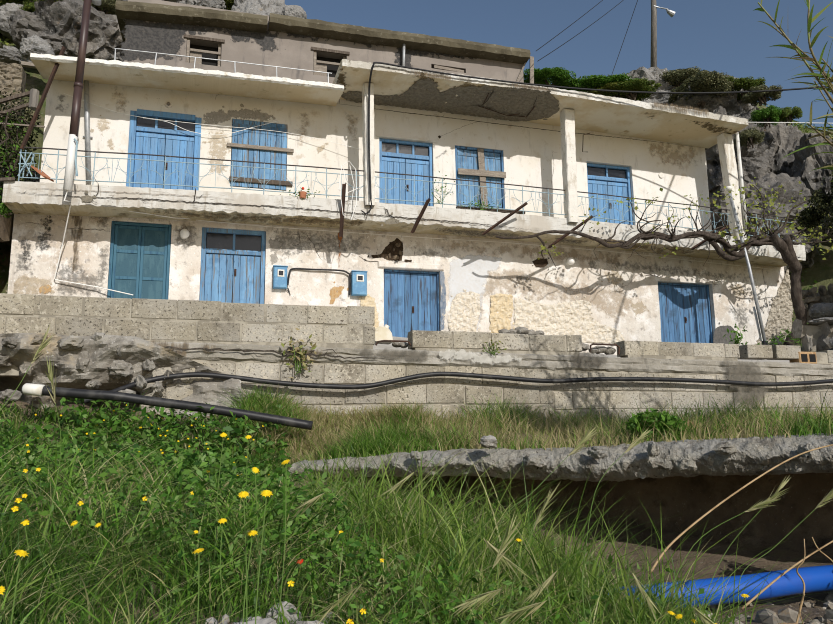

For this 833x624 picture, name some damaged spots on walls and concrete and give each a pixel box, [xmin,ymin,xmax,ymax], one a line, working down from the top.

spalling [341,91,362,103]
spalling [374,78,560,121]
peeling [202,104,275,172]
damp [21,216,52,261]
damp [71,216,82,270]
spalling [532,258,549,268]
peeling [601,266,623,285]
flaking render [444,289,625,344]